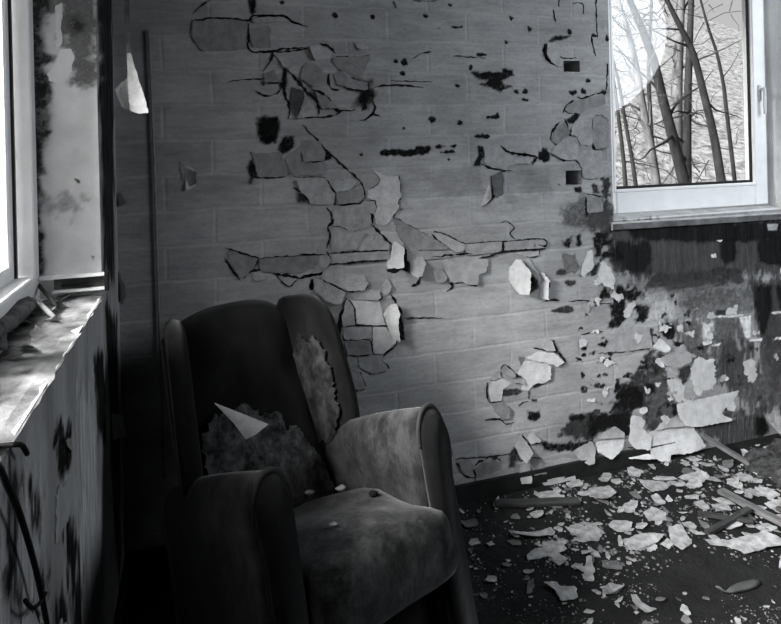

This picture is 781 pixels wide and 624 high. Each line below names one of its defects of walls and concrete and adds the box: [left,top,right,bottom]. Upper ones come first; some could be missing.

damp [33,0,115,286]
crack [303,125,360,181]
peeling [191,0,488,390]
crack [374,80,433,88]
crack [553,0,609,90]
damp [54,417,72,479]
damp [93,296,121,578]
peeling [451,249,739,498]
damp [556,196,781,447]
peeling [743,358,757,383]
peeling [756,412,781,436]
damp [2,454,84,624]